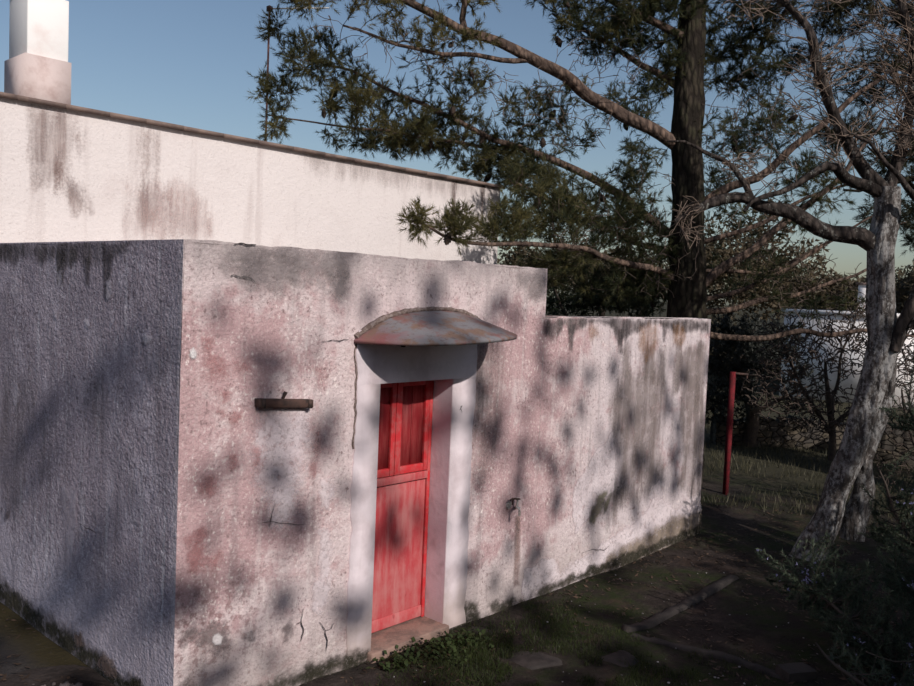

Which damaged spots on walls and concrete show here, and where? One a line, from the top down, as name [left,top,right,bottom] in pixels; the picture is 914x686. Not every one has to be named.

water stain [0,242,92,281]
water stain [546,318,593,349]
water stain [590,319,708,523]
water stain [0,582,142,686]
water stain [269,651,369,686]